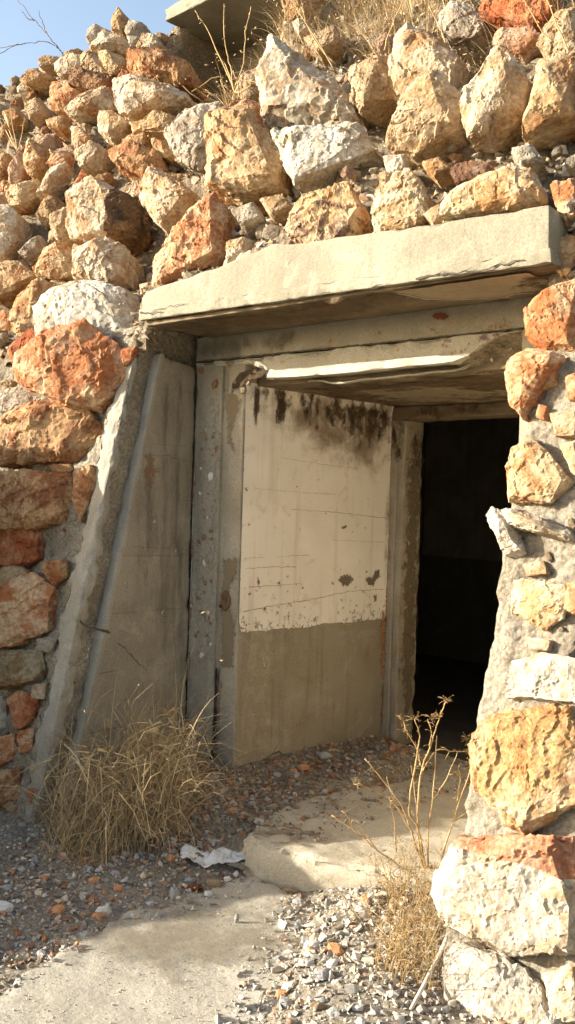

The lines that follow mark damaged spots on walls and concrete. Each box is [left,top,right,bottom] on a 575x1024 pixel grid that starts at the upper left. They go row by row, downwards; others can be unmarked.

peeling [192,329,523,671]
damp [276,375,508,462]